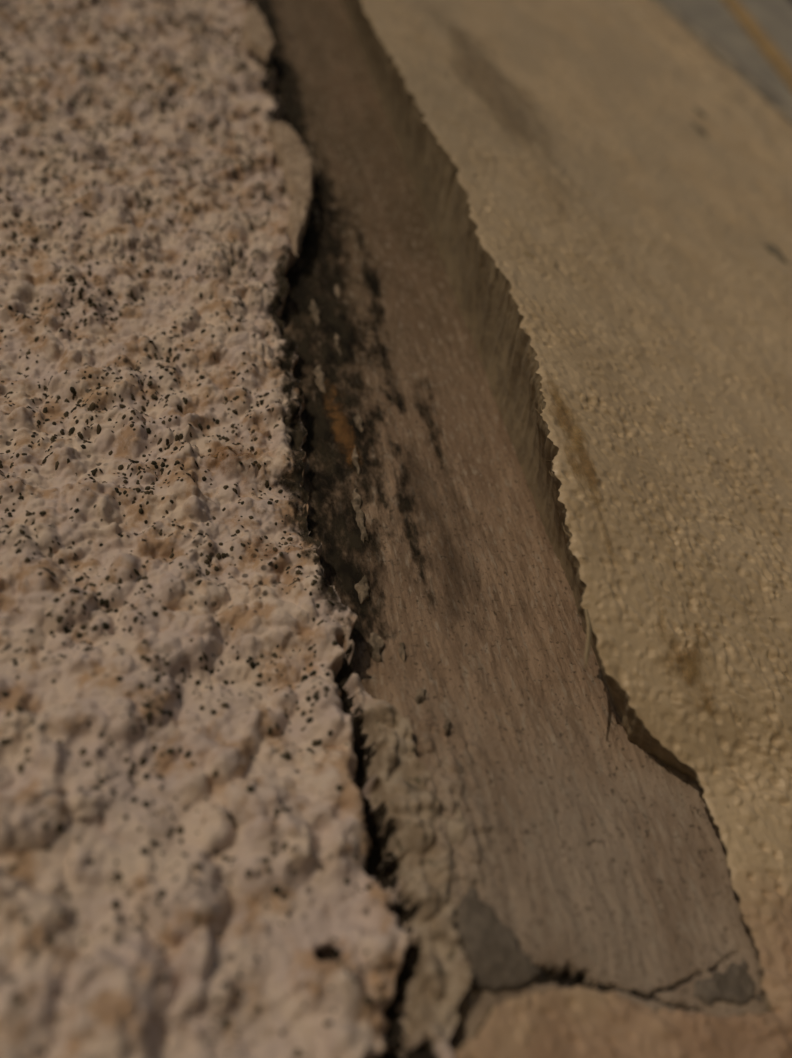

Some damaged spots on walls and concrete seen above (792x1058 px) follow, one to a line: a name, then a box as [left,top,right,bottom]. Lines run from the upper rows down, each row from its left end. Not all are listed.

damp [0,0,443,775]
spalling [241,0,773,1058]
damp [78,722,158,815]
damp [118,744,195,789]
damp [136,797,237,889]
crack [335,643,423,1058]
crack [538,952,738,1011]